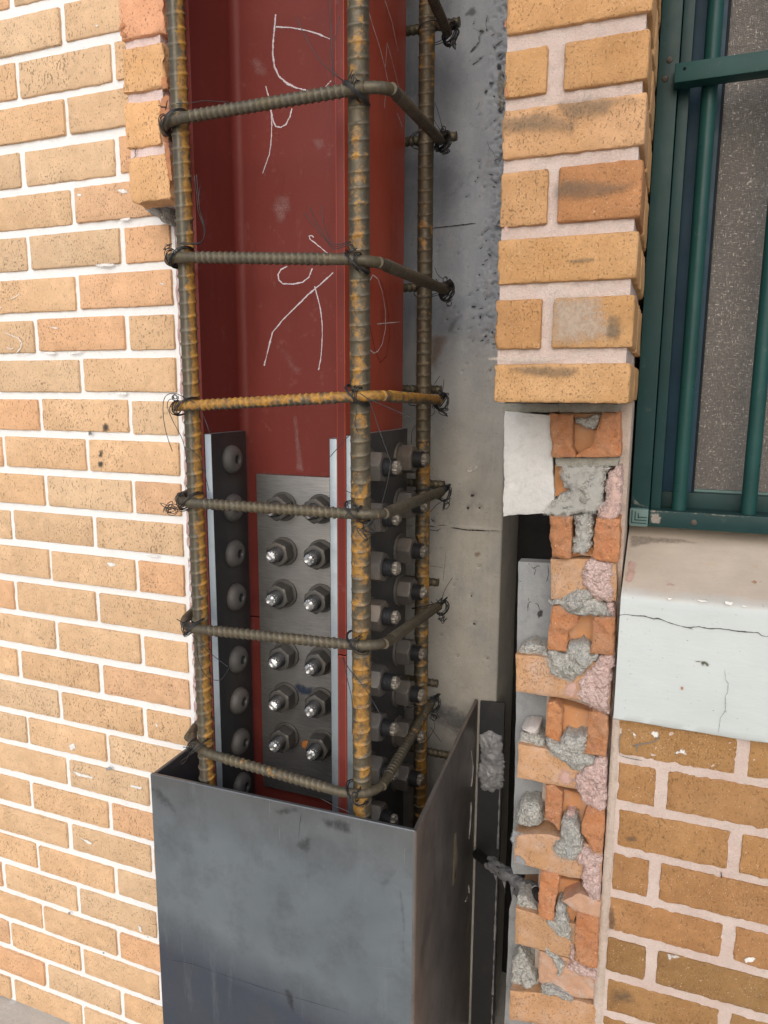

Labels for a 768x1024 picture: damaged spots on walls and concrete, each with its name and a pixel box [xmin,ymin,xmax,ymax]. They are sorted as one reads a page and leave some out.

spalling [550,411,623,458]
spalling [549,514,575,559]
spalling [593,514,622,563]
spalling [537,605,580,652]
spalling [590,609,618,655]
crack [615,614,768,637]